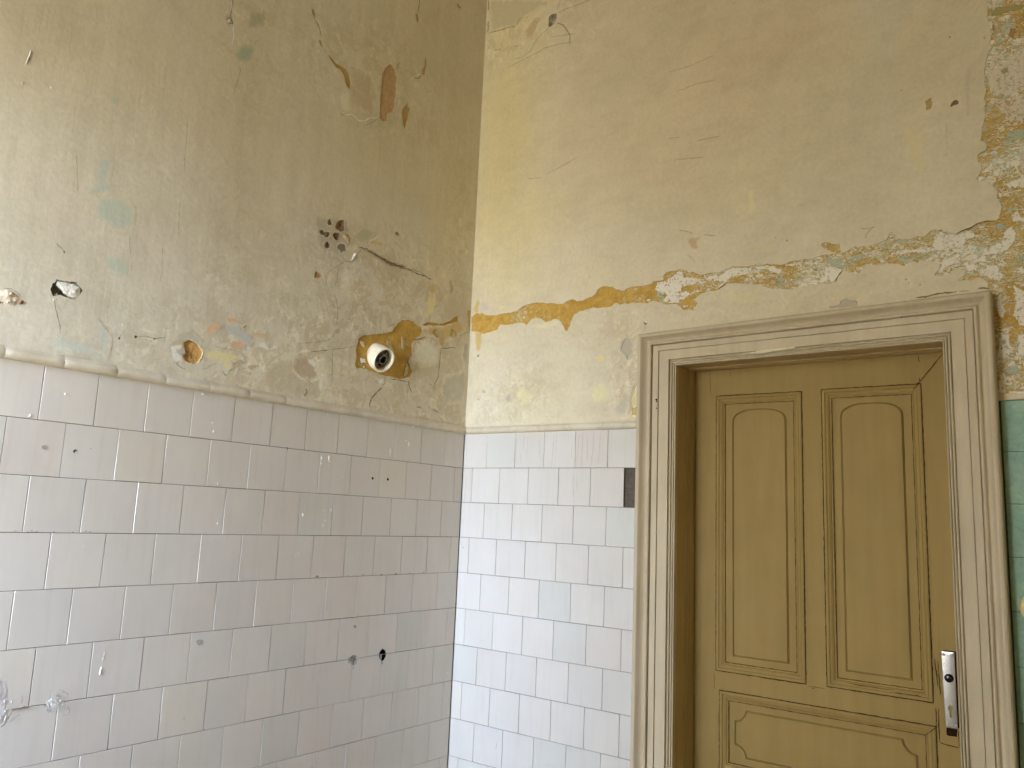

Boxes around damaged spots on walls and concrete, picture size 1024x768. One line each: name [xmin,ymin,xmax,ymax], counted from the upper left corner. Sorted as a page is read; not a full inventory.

peeling [355,0,1024,394]
spalling [311,214,357,261]
crack [359,245,431,279]
spalling [0,288,24,306]
spalling [51,279,83,337]
spalling [169,340,204,364]
peeling [624,468,635,507]